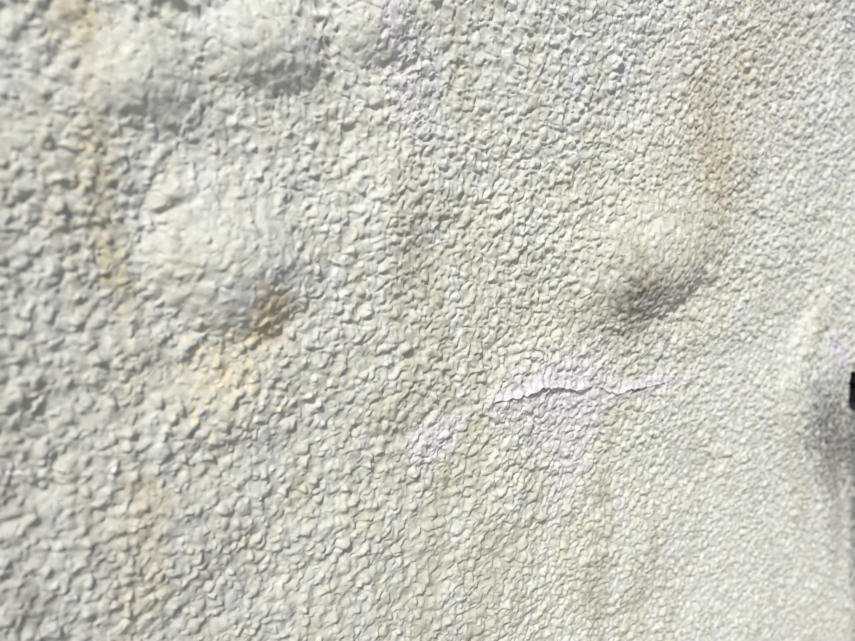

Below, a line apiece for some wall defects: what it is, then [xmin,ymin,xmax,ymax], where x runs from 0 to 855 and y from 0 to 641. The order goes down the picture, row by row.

crack [470,313,708,549]